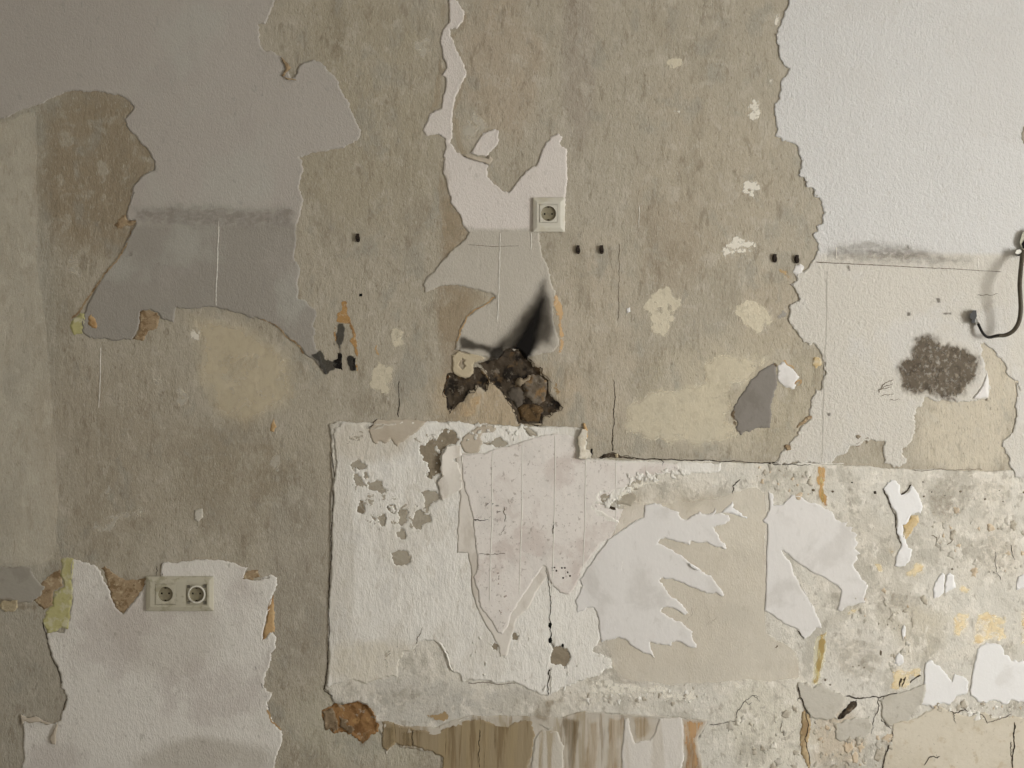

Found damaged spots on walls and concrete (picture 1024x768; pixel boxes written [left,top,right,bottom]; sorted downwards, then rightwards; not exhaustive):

damp [899,335,978,400]
flaking render [322,348,1024,768]
crack [546,572,570,695]
crack [780,686,811,766]
crack [847,693,897,768]
crack [949,708,1016,768]